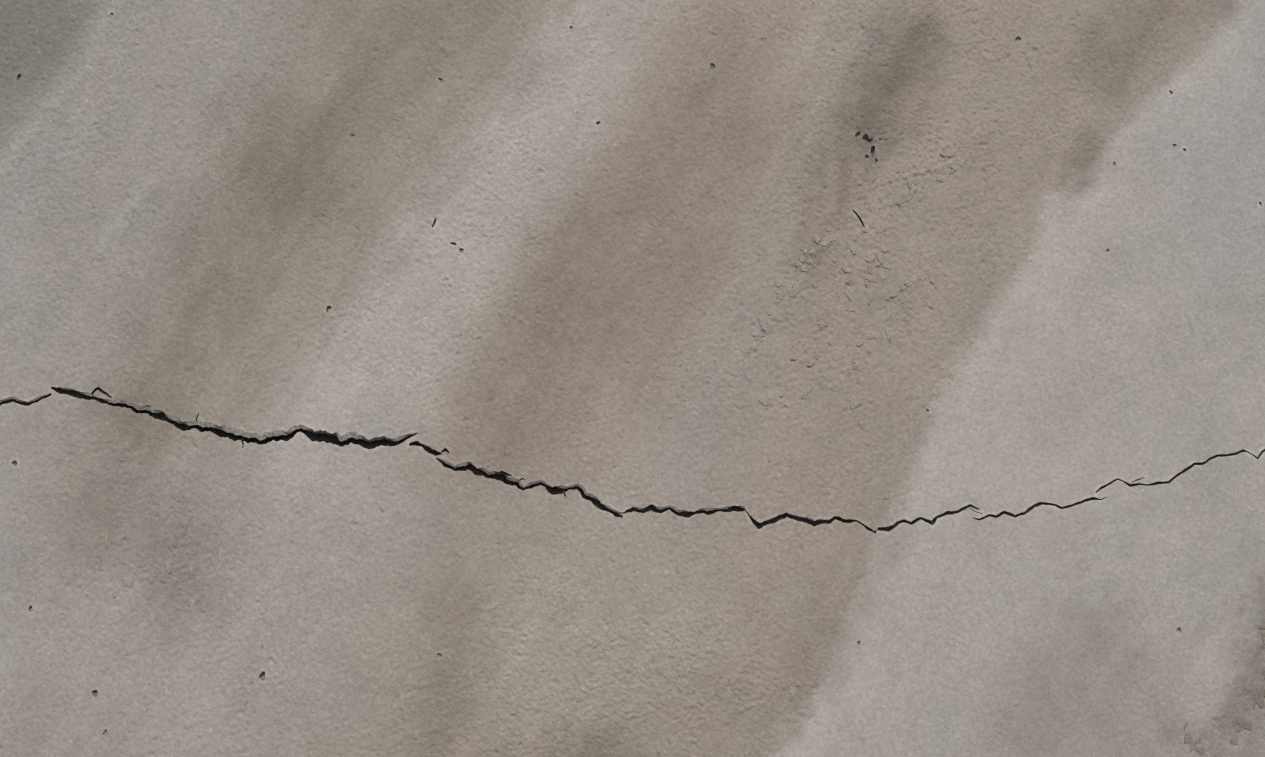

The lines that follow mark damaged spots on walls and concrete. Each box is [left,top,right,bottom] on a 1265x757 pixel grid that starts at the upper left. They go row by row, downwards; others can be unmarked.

crack [0,387,1265,533]